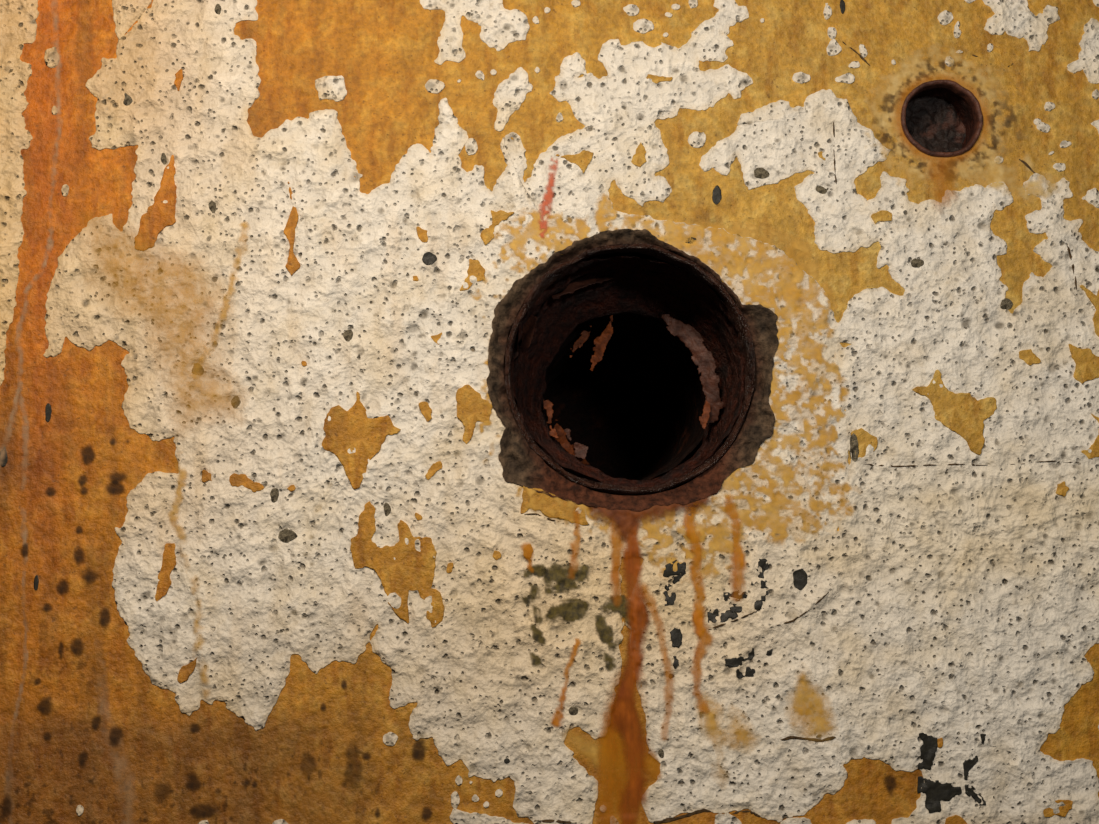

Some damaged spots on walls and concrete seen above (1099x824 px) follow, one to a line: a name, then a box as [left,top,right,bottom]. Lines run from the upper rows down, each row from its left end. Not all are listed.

peeling [965,0,1060,52]
peeling [0,0,39,386]
rust [570,315,613,371]
rust [661,314,724,429]
leakage [79,447,94,494]
leakage [108,473,124,493]
peeling [43,0,779,824]
rust [543,399,589,465]
peeling [596,89,1099,824]
leakage [75,549,96,582]
rust [571,497,711,824]
leakage [413,741,424,760]